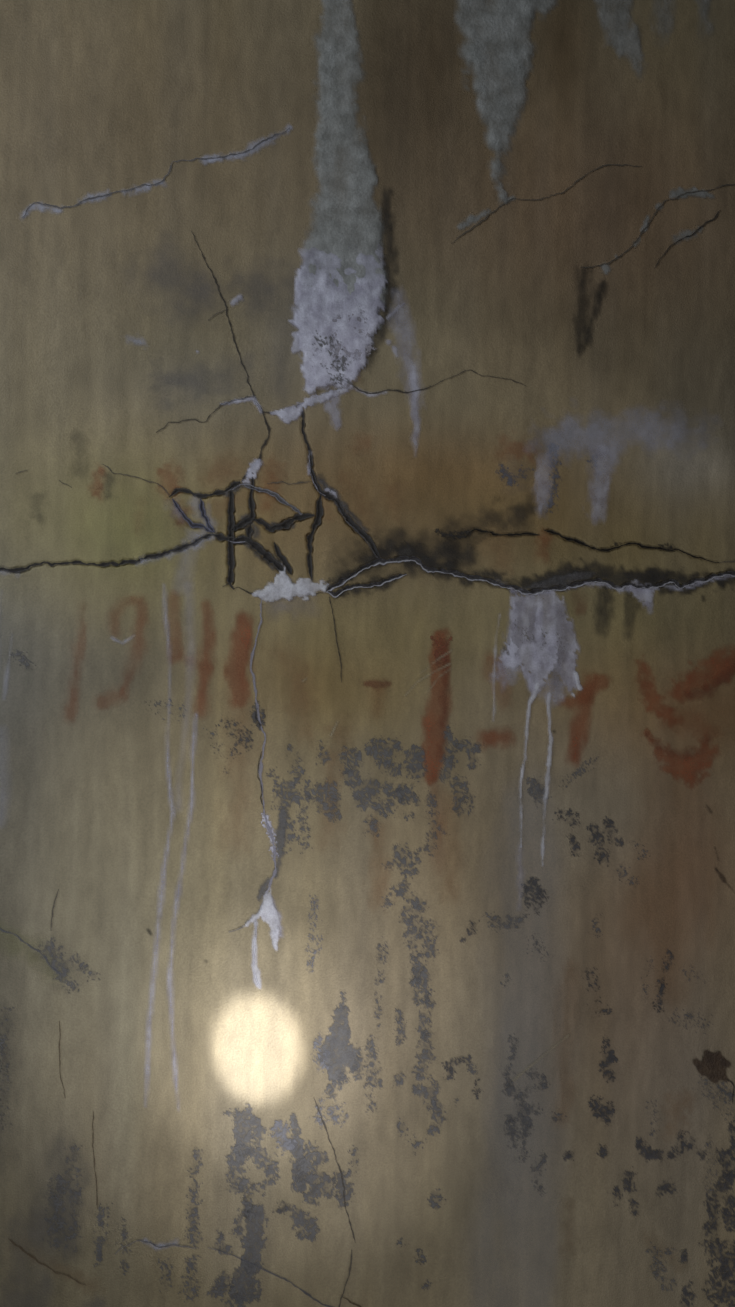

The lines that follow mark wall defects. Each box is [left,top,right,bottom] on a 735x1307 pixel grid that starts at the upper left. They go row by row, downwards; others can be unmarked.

leakage [458,0,554,201]
leakage [289,0,397,419]
crack [0,231,735,984]
efflorescence [500,595,582,802]
crack [115,1099,361,1307]
peeling [158,719,481,1307]
peeling [460,877,546,942]
peeling [502,1035,566,1192]
peeling [527,778,648,884]
peeling [588,1095,615,1124]
peeling [599,1037,618,1083]
peeling [613,1050,735,1307]